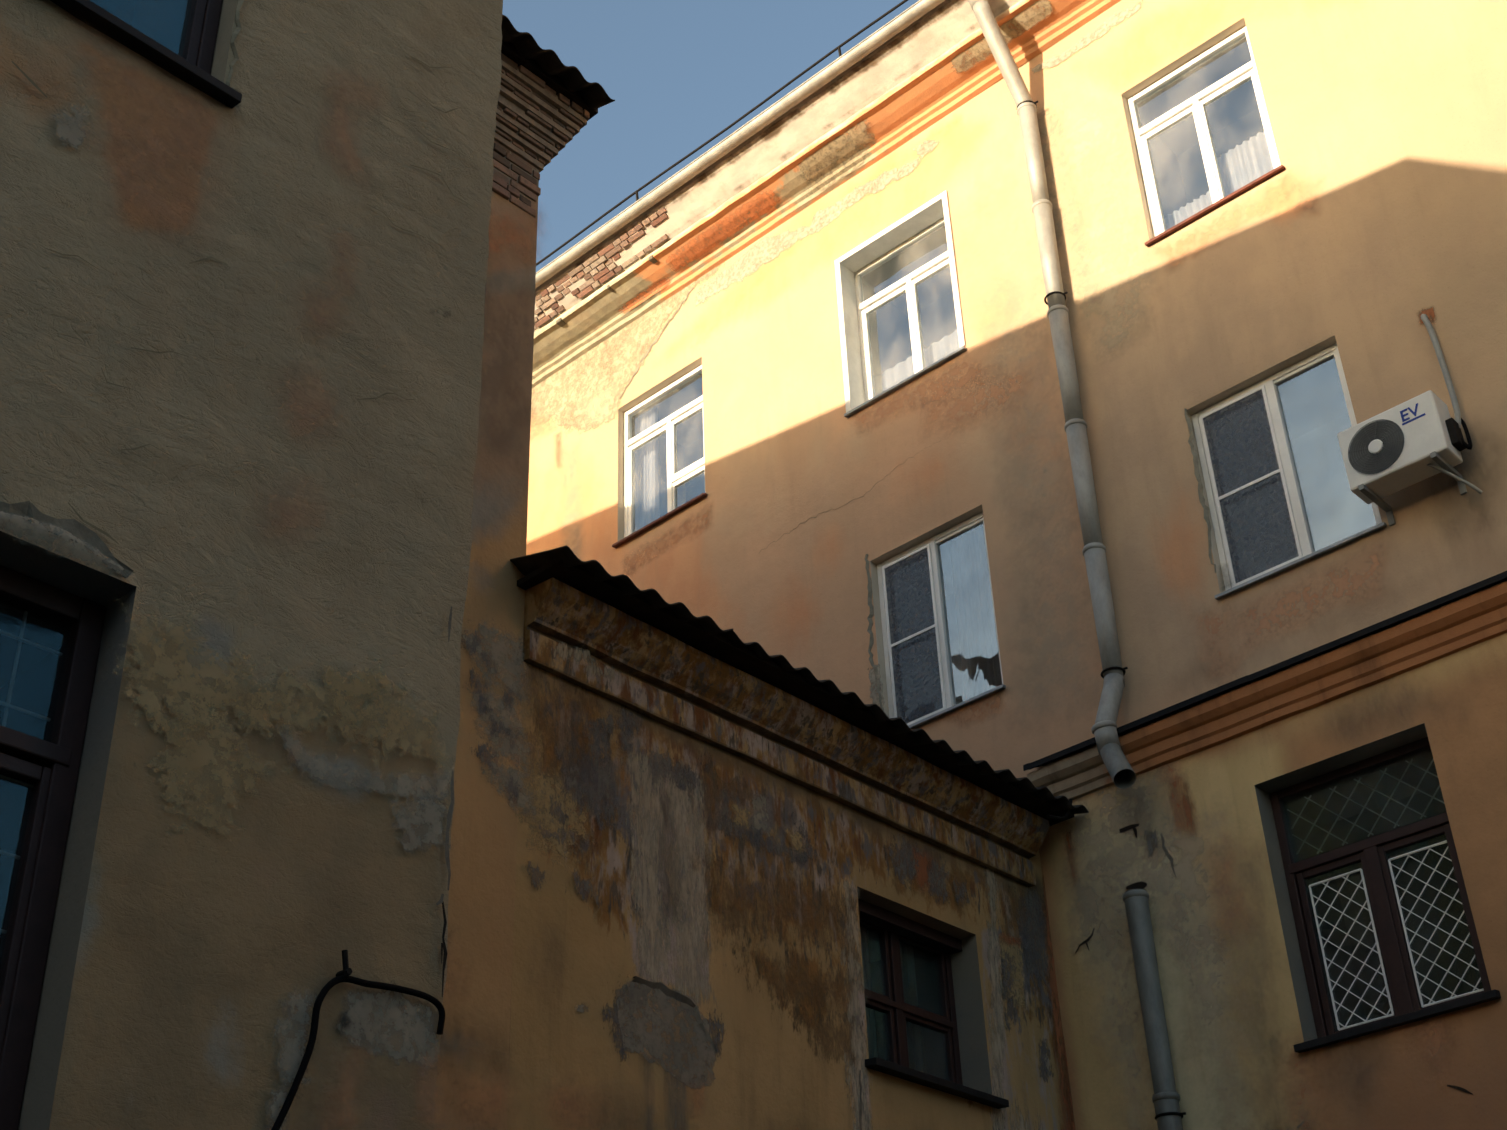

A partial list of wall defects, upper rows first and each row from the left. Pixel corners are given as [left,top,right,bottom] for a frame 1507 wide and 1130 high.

peeling [951,0,1052,73]
flaking render [530,120,919,433]
crack [436,771,454,997]
peeling [338,983,438,1075]
flaking render [577,976,724,1089]